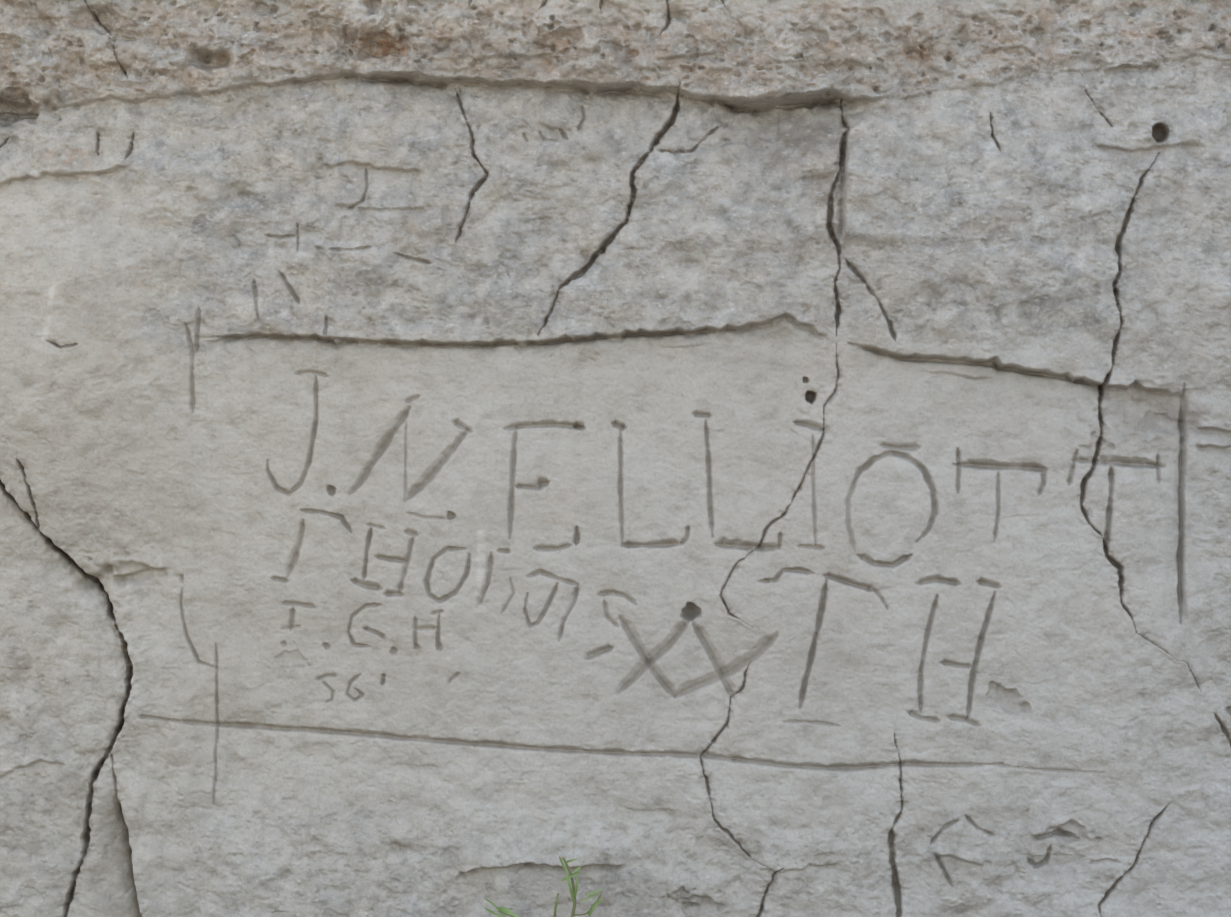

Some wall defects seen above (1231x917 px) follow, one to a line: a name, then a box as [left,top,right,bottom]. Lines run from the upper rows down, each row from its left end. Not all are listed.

crack [454,86,490,247]
crack [537,81,723,337]
crack [718,95,899,629]
crack [1079,152,1231,752]
crack [0,458,134,917]
crack [699,660,785,917]
crack [887,732,905,917]
crack [1097,802,1172,917]